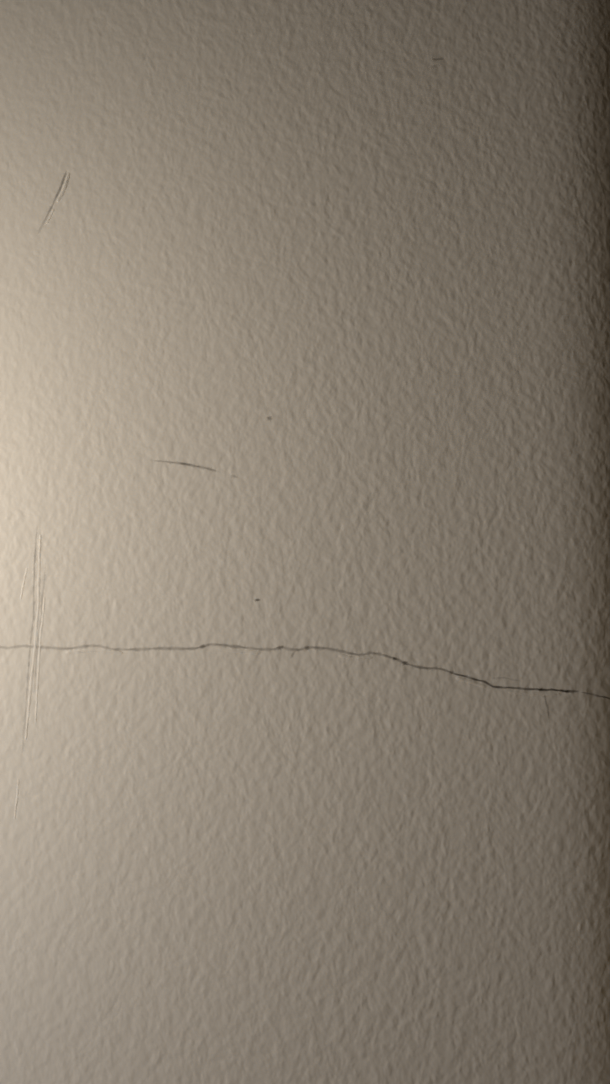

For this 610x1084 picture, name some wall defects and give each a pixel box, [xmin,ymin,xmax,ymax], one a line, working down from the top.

crack [455,674,569,697]